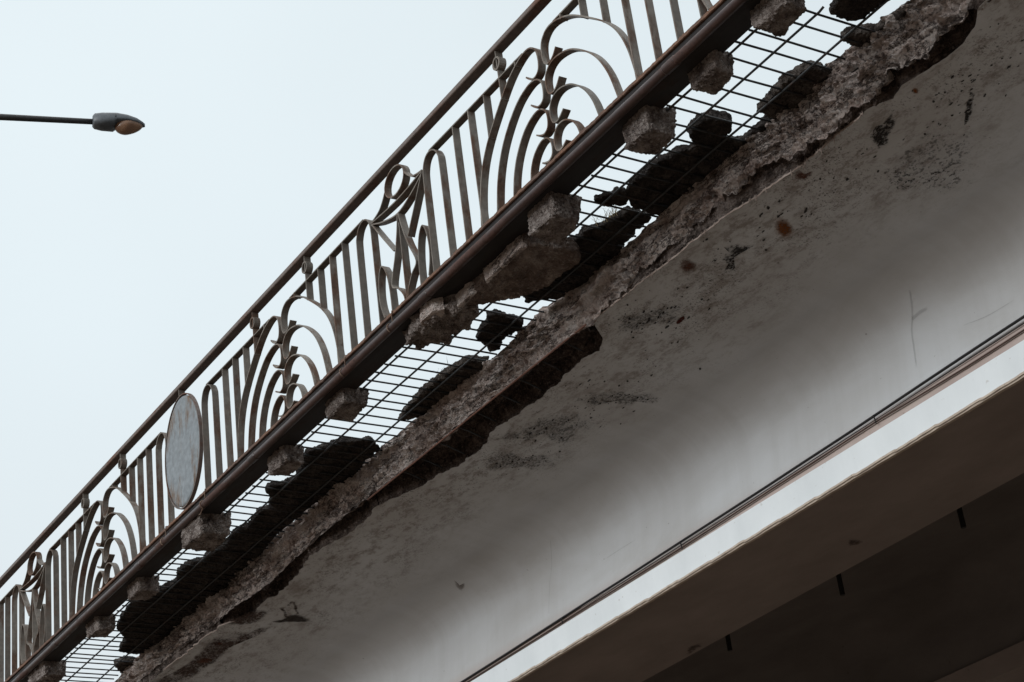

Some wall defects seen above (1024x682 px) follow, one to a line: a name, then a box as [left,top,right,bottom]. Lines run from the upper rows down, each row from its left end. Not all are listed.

leakage [861,115,895,158]
spalling [868,0,992,106]
leakage [932,39,1024,136]
corrosion [777,220,791,236]
spalling [96,0,889,682]
leakage [609,287,697,344]
leakage [489,350,656,475]
spalling [60,550,233,682]